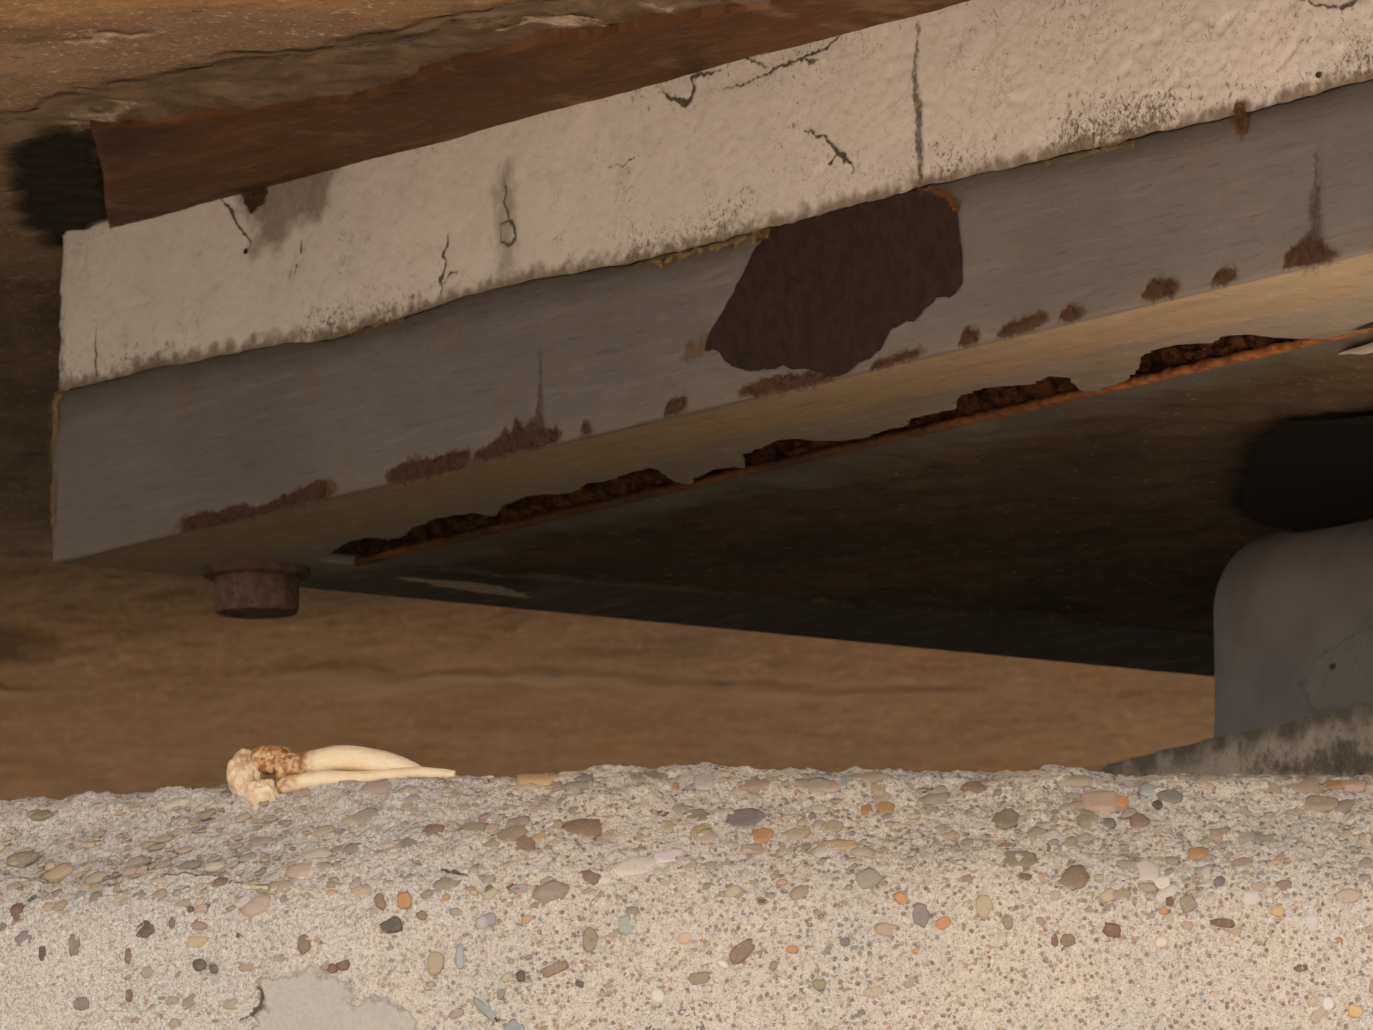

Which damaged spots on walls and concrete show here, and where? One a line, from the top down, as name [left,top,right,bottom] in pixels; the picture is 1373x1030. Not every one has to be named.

crack [663,37,838,108]
crack [804,129,854,174]
crack [500,177,516,247]
corrosion [1283,172,1336,269]
peeling [705,186,962,377]
corrosion [997,304,1082,338]
corrosion [1141,278,1179,301]
corrosion [1211,269,1234,287]
corrosion [353,326,1373,567]